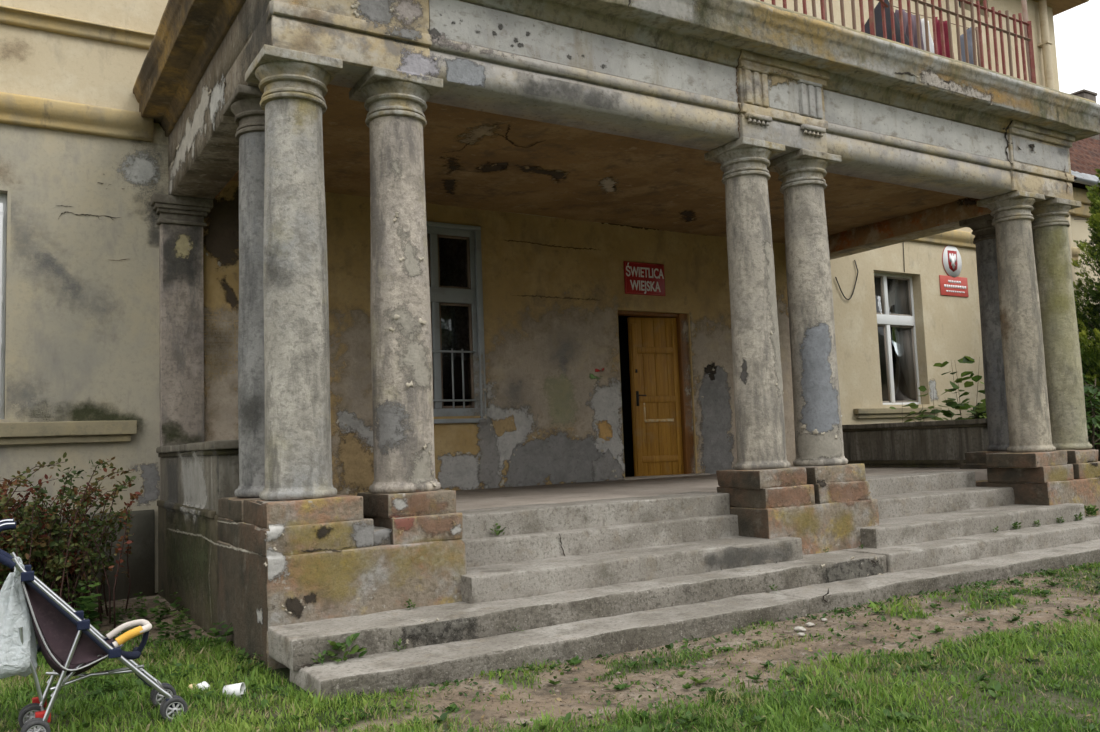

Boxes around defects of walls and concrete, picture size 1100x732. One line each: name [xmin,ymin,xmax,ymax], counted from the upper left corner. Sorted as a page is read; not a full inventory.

peeling [351,0,530,80]
peeling [117,73,225,194]
crack [58,205,126,261]
peeling [329,310,374,495]
peeling [384,292,625,536]
peeling [683,316,748,473]
peeling [763,240,842,465]
flaking render [264,524,290,581]
spalling [767,479,871,508]